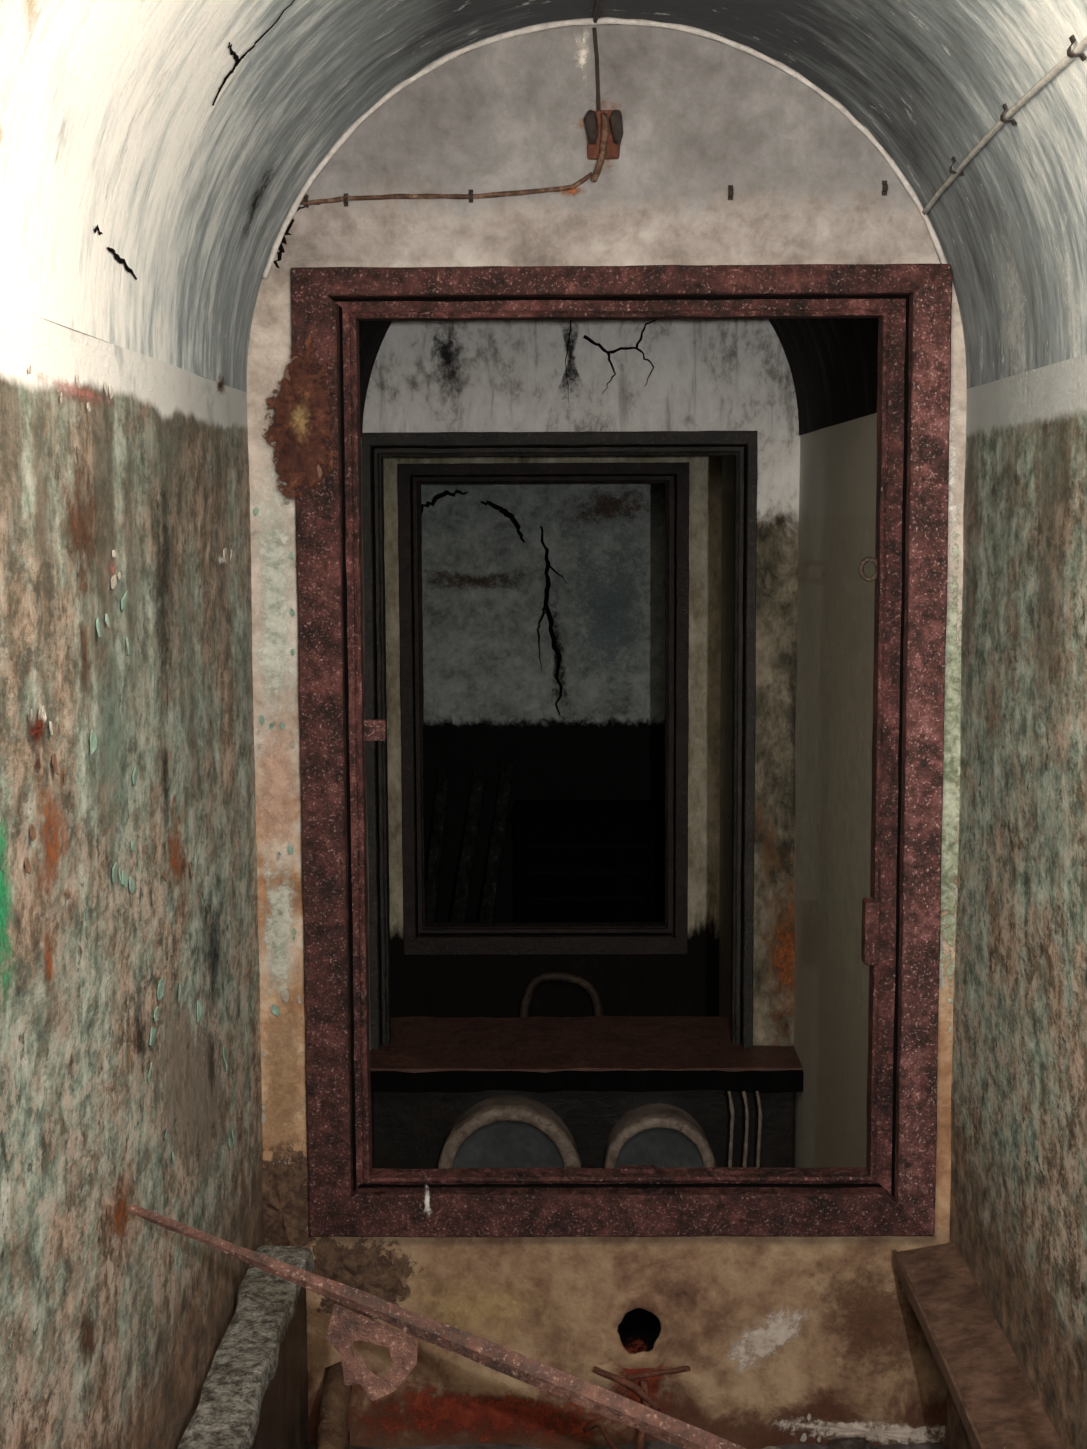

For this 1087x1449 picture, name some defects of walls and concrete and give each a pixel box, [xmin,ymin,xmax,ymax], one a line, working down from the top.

crack [565,320,656,407]
crack [421,489,569,715]
water stain [730,1310,804,1373]
corrosion [613,1342,666,1410]
corrosion [347,1384,601,1444]